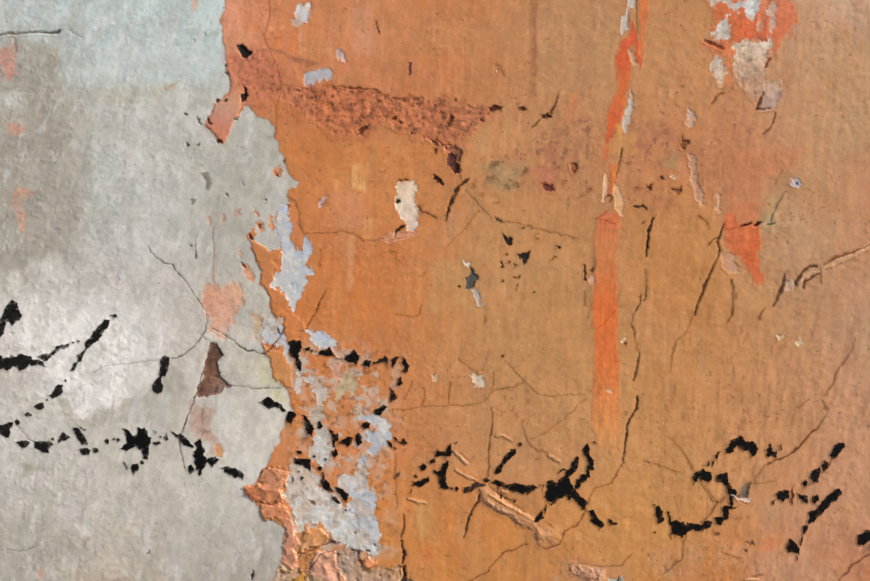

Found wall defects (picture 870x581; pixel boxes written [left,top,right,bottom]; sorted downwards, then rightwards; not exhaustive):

flaking render [205,43,504,187]
peeling [699,0,799,135]
peeling [378,178,420,246]
peeling [457,259,485,309]
flaking render [493,216,531,292]
crack [670,169,788,373]
crack [758,242,870,321]
crack [86,246,326,472]
peeling [197,203,415,581]
crack [389,349,587,539]
crack [469,217,726,581]
crack [395,452,407,581]